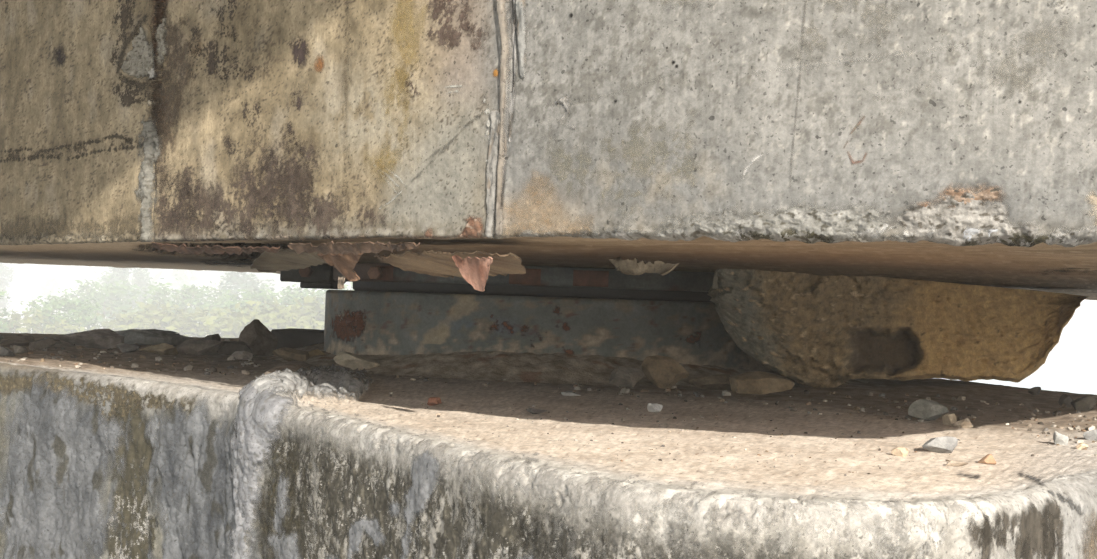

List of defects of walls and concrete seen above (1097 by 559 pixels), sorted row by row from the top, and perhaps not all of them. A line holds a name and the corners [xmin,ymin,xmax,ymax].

leakage [55,48,66,65]
spalling [121,18,167,79]
rust [148,0,168,137]
leakage [426,0,482,50]
leakage [109,0,385,241]
leakage [1,215,142,245]
spalling [519,187,1097,247]
peeling [0,231,526,291]
peeling [609,257,679,276]
rust [331,309,367,342]
leakage [0,370,195,559]
leakage [244,401,1063,559]